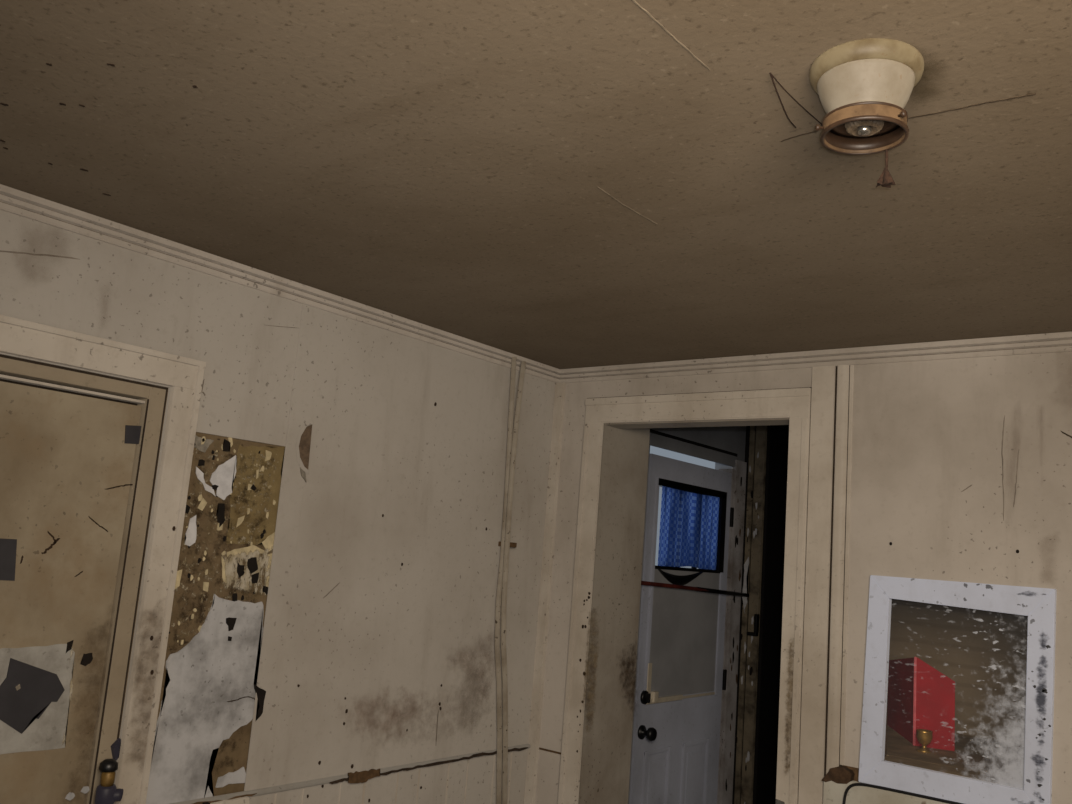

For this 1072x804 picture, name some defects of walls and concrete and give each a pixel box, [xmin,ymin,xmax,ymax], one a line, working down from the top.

peeling [146,432,285,804]